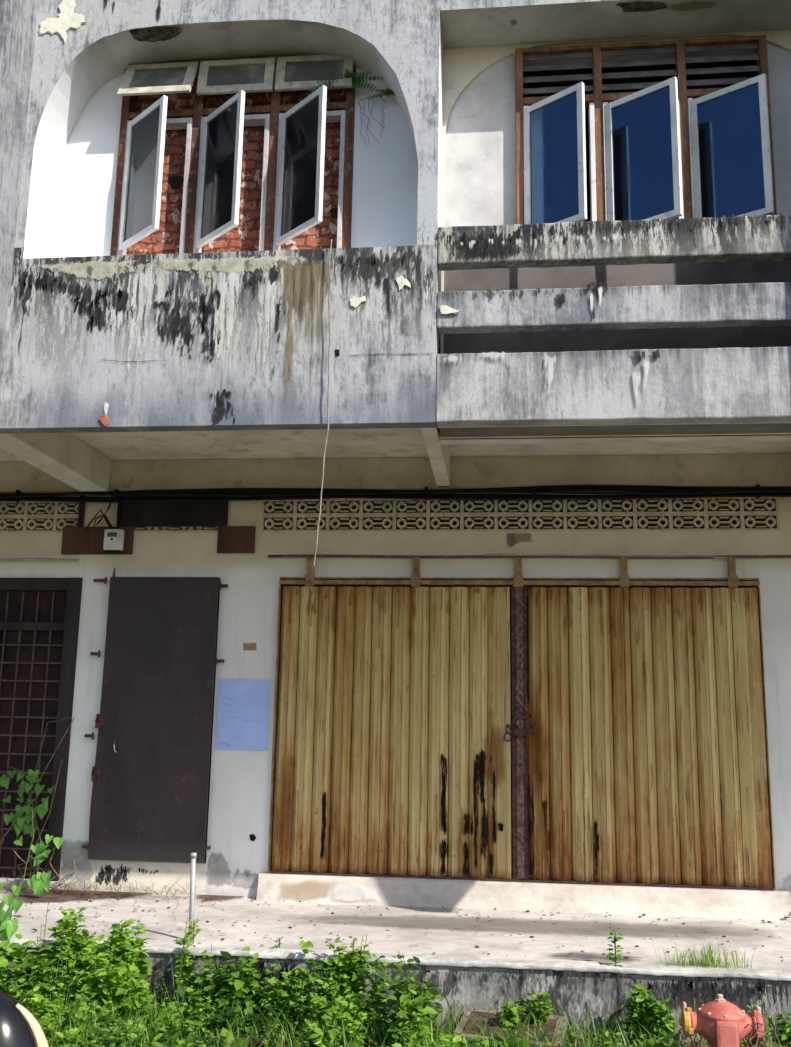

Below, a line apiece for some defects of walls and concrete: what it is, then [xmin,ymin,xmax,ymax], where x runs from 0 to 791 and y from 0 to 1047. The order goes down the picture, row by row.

peeling [39,0,87,42]
damp [437,212,786,262]
peeling [396,275,411,291]
damp [19,252,415,388]
peeling [349,296,366,308]
peeling [440,305,460,315]
damp [206,389,237,426]
damp [96,864,159,886]
flaking render [207,853,259,888]
damp [555,952,638,960]
damp [366,965,791,1017]